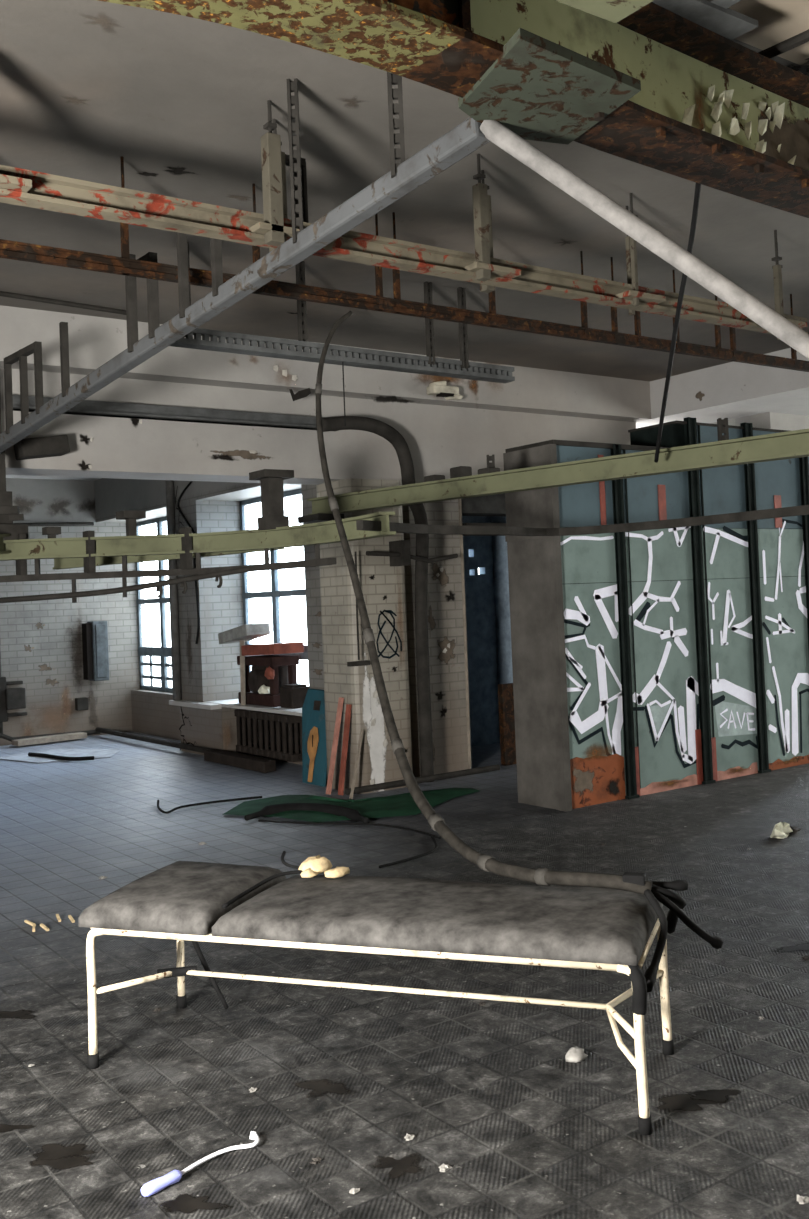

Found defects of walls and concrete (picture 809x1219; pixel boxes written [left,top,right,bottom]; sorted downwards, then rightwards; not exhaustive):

peeling [682,85,809,168]
rust [570,746,698,809]
rust [717,755,809,781]